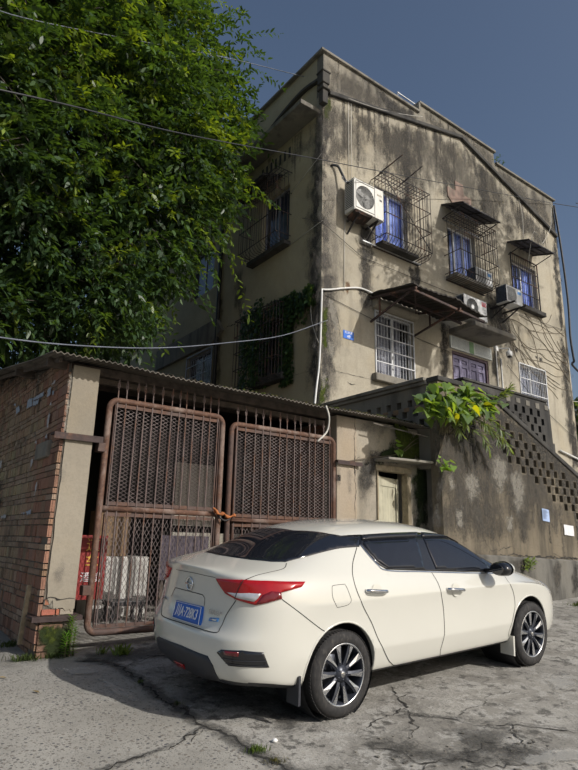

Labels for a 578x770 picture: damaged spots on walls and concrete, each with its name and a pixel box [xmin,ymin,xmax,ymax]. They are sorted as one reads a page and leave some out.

water stain [342,83,454,234]
water stain [309,108,335,401]
water stain [487,294,510,333]
water stain [510,199,562,328]
peeling [14,380,55,443]
water stain [433,338,578,543]
flaking render [35,599,73,659]